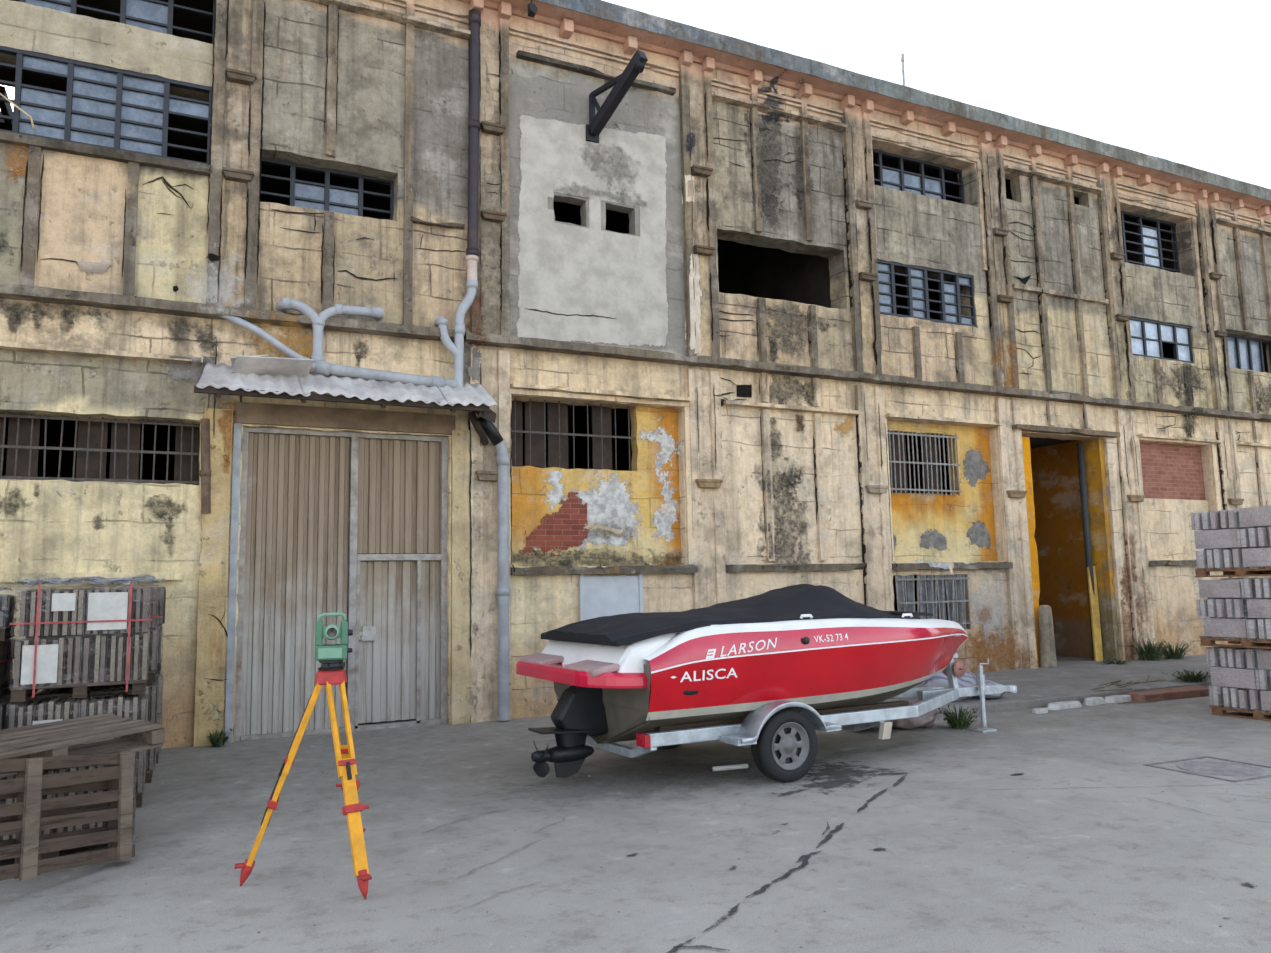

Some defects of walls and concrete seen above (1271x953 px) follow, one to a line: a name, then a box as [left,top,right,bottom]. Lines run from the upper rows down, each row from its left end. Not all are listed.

water stain [758,75,796,99]
water stain [744,108,813,225]
peeling [520,427,682,556]
mould [758,305,835,577]
spalling [915,529,954,574]
spalling [963,448,990,487]
spalling [966,520,991,550]
crack [667,789,887,953]